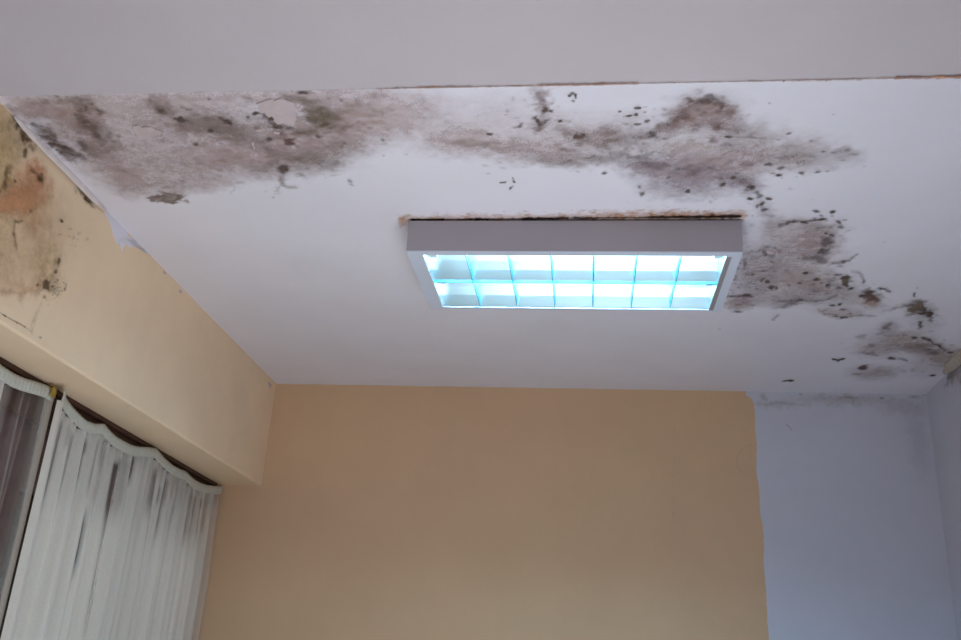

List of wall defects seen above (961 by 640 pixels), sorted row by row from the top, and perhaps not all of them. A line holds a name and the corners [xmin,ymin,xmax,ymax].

damp [0,89,425,235]
damp [429,95,813,211]
damp [730,210,889,313]
damp [883,293,953,362]